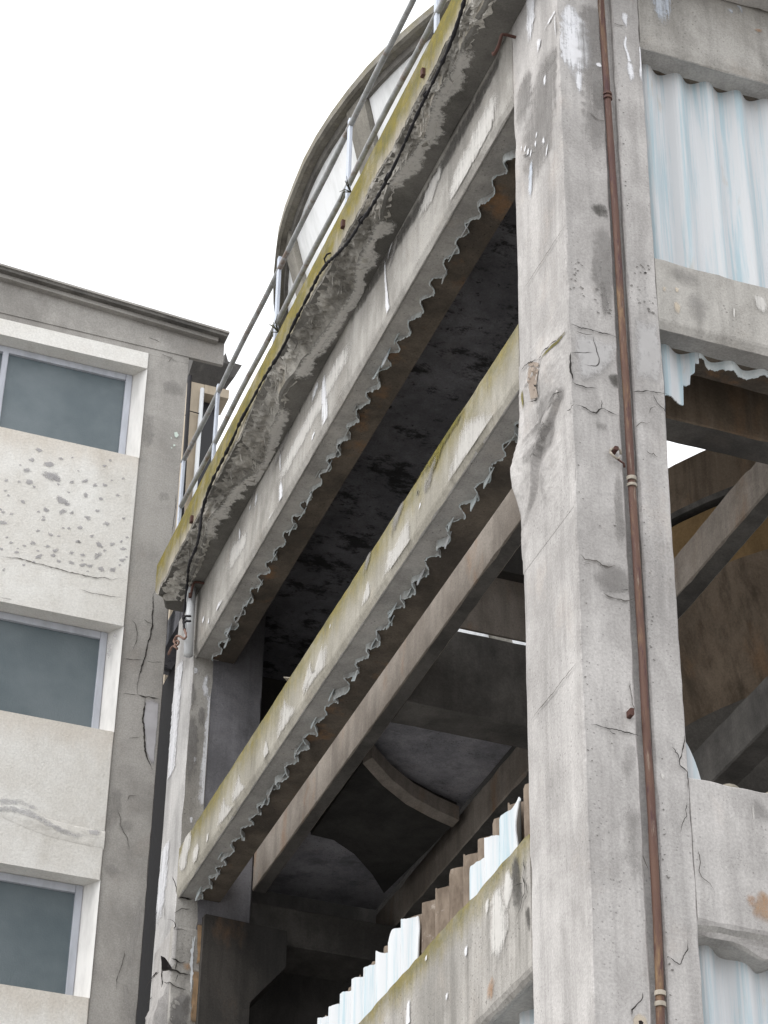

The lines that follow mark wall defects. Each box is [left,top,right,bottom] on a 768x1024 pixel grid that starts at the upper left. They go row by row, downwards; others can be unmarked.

spalling [160,0,496,601]
water stain [205,51,498,538]
spalling [527,362,539,399]
crack [522,324,666,427]
water stain [0,448,128,572]
efflorescence [228,529,246,572]
crack [123,591,158,765]
crack [594,685,639,736]
crack [672,736,688,829]